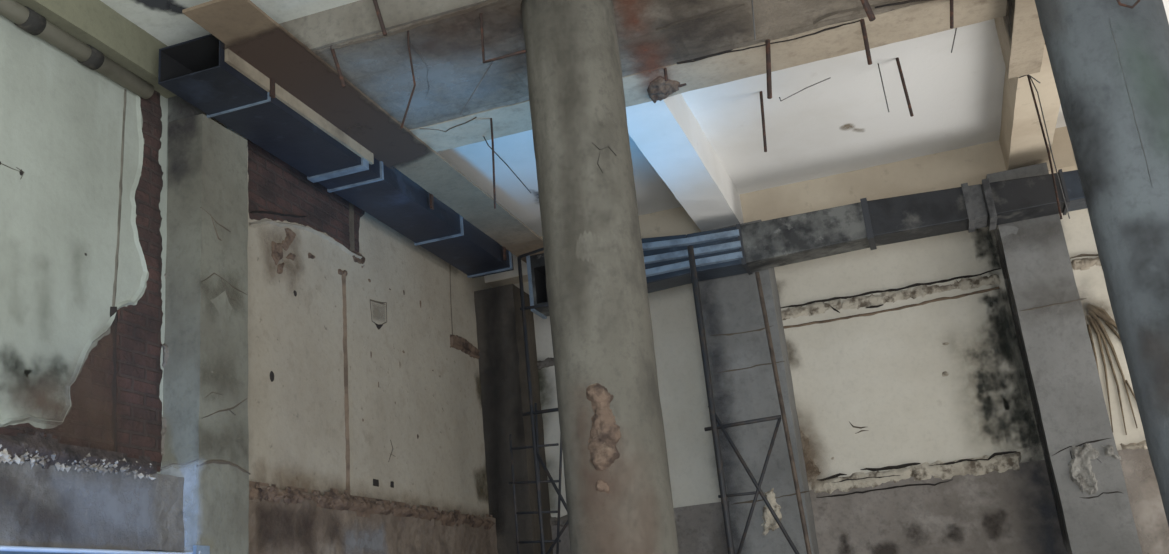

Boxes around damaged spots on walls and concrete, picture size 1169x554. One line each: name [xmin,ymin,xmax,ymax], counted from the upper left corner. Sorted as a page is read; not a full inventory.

water stain [136,0,186,14]
spalling [647,77,687,103]
crack [420,117,476,132]
flaking render [247,139,371,282]
water stain [975,226,1001,273]
peeling [0,90,169,476]
water stain [4,334,113,451]
water stain [977,289,1041,460]
spalling [586,383,621,494]
peeling [910,451,1021,481]
spalling [1068,443,1122,495]
spalling [249,479,495,530]